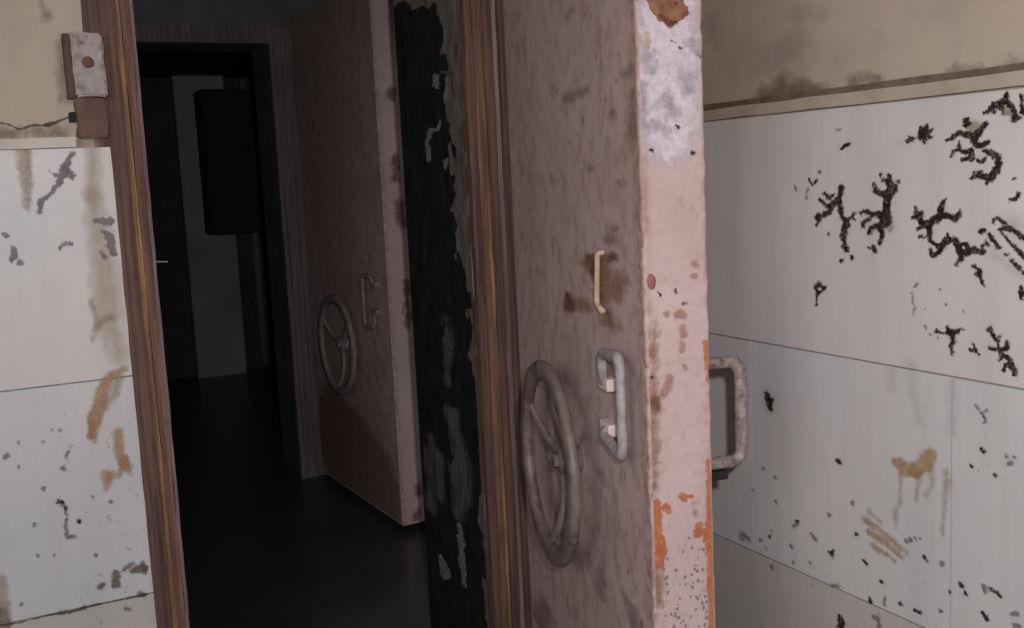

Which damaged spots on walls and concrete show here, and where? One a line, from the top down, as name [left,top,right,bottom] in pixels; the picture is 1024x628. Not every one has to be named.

peeling [638,0,702,165]
peeling [37,152,76,214]
peeling [1,232,23,265]
peeling [93,217,117,259]
rust [87,367,126,439]
rust [103,430,130,489]
rust [892,450,936,477]
rust [653,493,694,568]
rust [863,518,902,561]